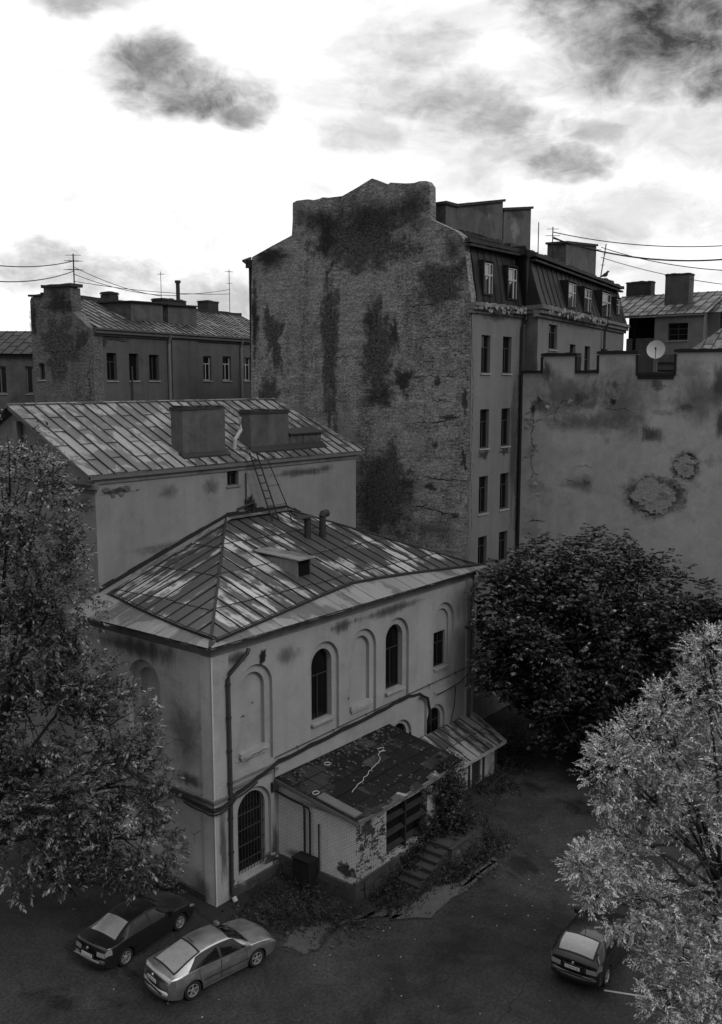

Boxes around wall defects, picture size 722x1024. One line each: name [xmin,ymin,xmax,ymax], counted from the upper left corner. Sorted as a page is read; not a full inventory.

water stain [365,368,412,407]
spalling [626,453,699,519]
flaking render [358,820,375,837]